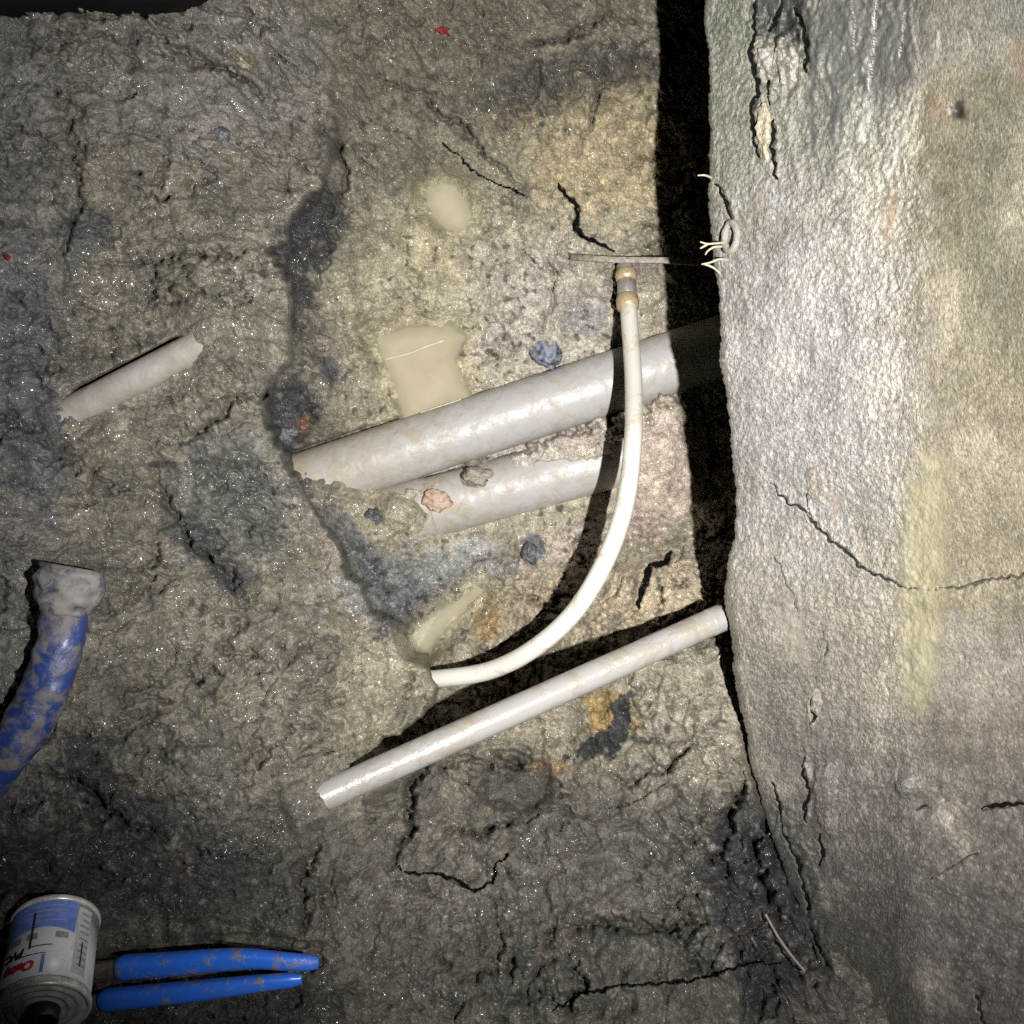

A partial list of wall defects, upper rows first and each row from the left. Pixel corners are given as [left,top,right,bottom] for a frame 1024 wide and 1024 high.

spalling [748,0,817,179]
crack [770,483,1024,591]